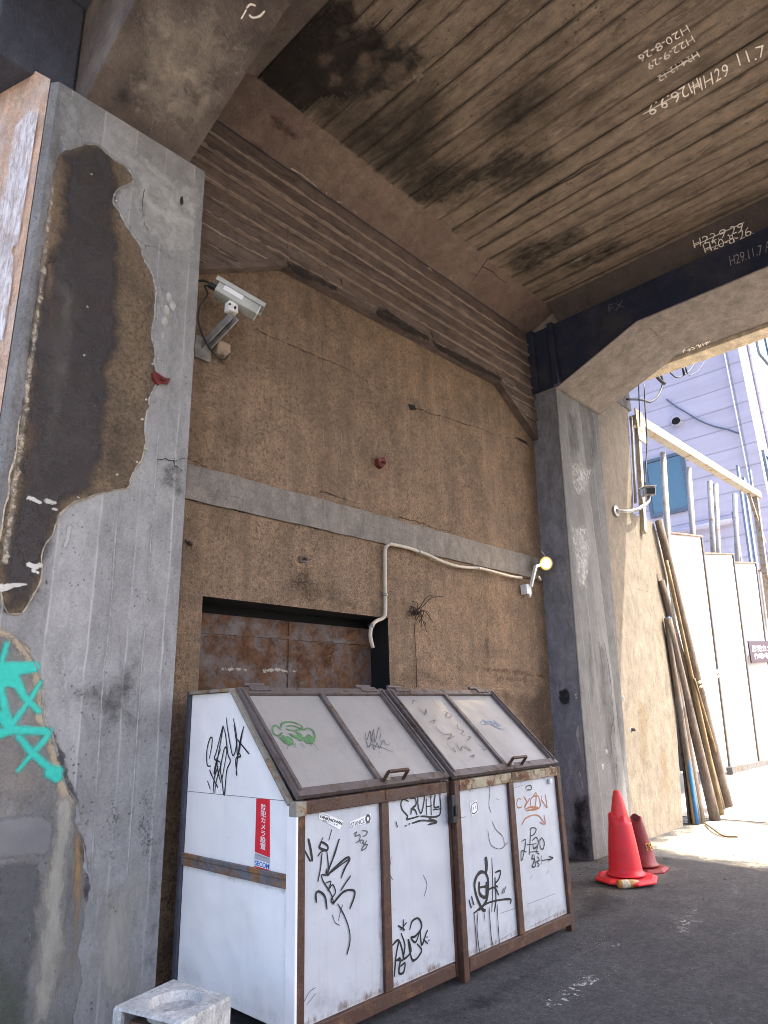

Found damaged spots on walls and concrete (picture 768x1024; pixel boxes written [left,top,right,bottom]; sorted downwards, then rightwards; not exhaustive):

water stain [260,0,434,194]
spalling [0,110,168,616]
crack [256,329,528,445]
spalling [0,628,90,1024]